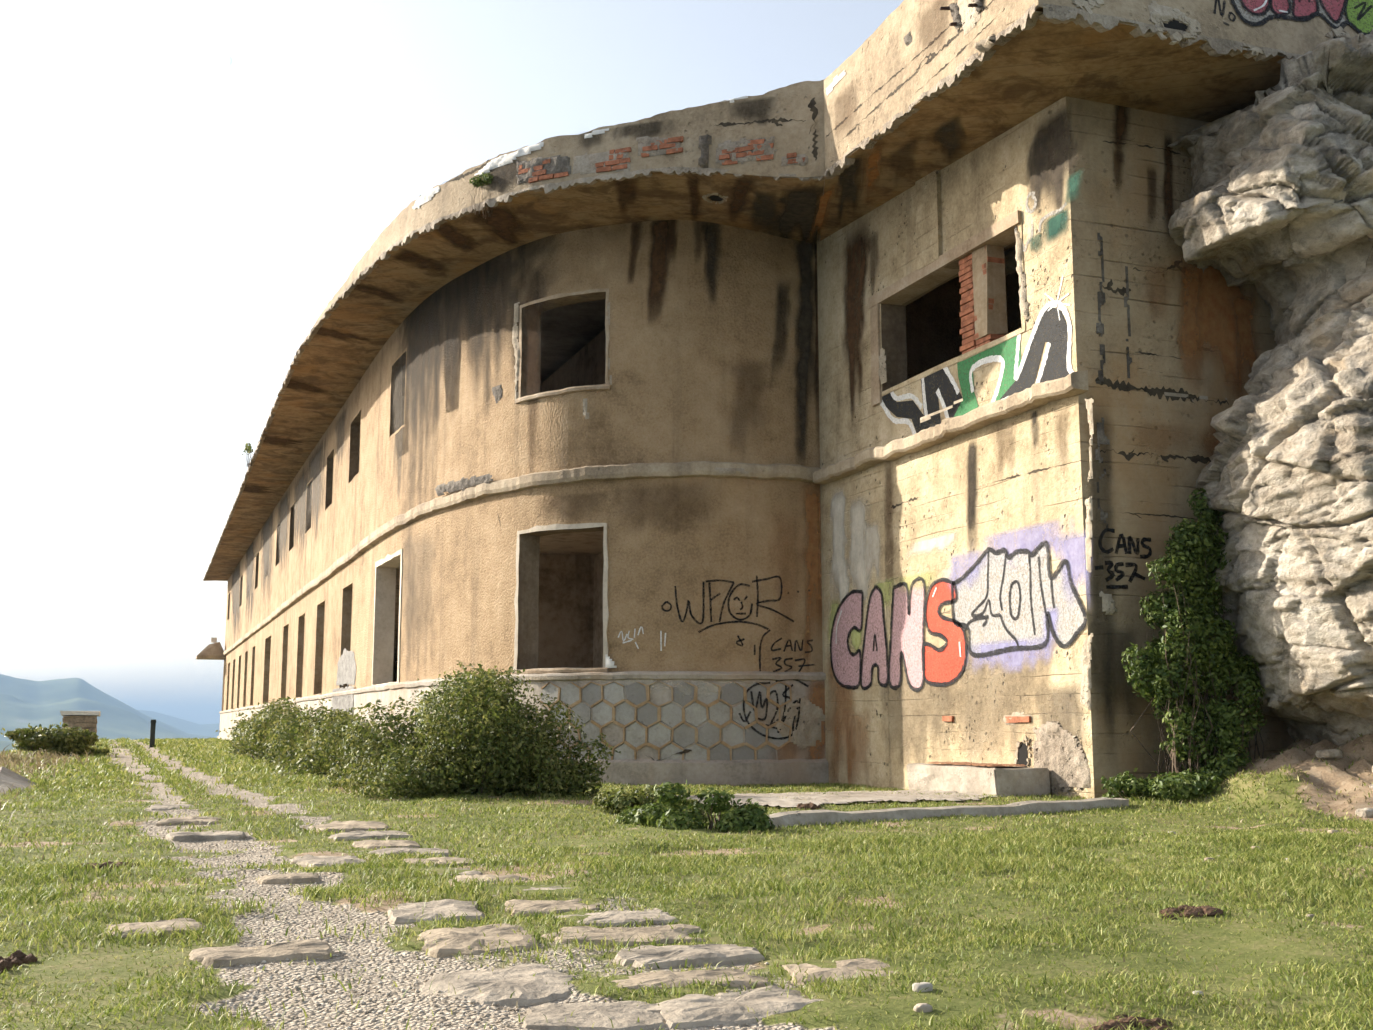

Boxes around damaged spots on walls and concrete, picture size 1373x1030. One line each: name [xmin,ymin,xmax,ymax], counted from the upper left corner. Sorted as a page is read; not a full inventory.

water stain [838,158,861,219]
water stain [935,118,962,159]
water stain [1028,109,1080,209]
water stain [629,220,676,316]
water stain [697,222,719,299]
spalling [203,0,1301,581]
water stain [752,190,821,456]
water stain [844,231,877,414]
rust [1179,264,1257,387]